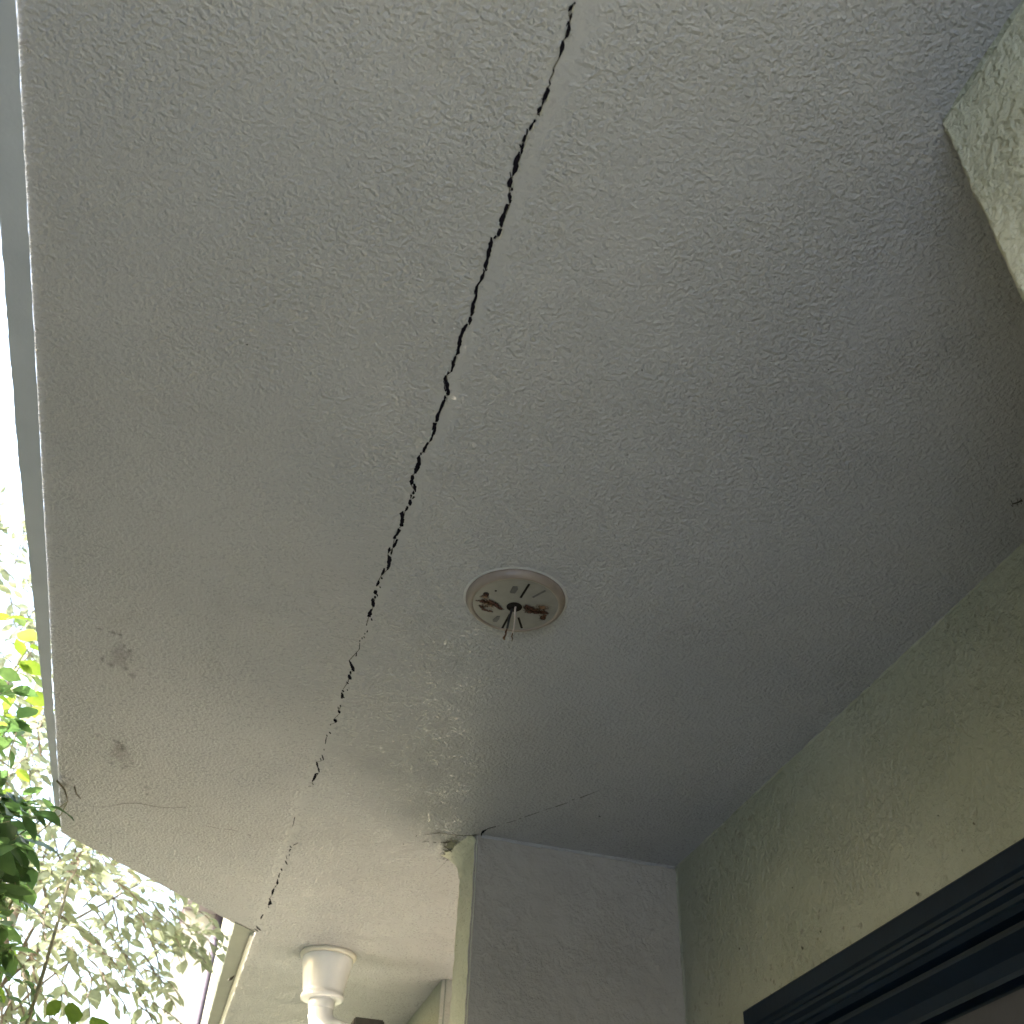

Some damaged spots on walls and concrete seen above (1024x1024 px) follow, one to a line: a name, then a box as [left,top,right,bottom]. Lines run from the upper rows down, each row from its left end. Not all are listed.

crack [310,2,576,787]
crack [255,817,298,932]